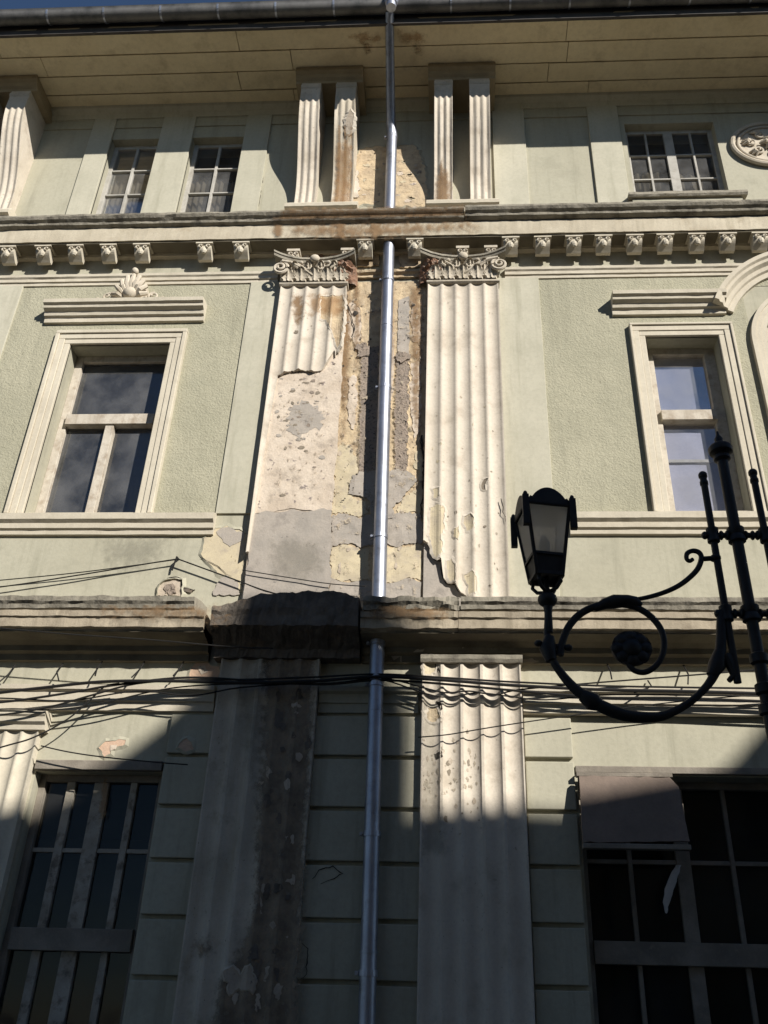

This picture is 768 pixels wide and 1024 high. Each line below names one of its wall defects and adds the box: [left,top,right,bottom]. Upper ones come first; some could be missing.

flaking render [342,108,357,136]
rust [273,131,470,238]
flaking render [353,143,431,209]
flaking render [255,252,498,607]
flaking render [155,576,195,597]
peeling [96,736,129,760]
water stain [213,658,314,1024]